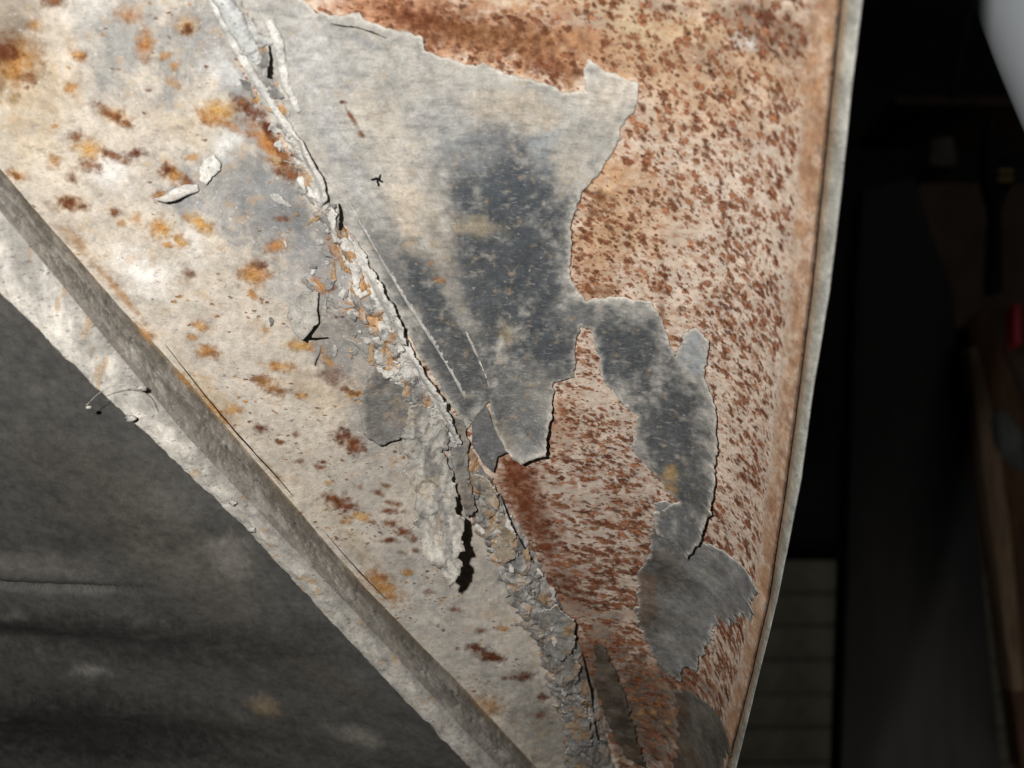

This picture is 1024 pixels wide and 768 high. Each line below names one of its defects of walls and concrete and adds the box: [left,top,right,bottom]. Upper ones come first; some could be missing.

rust [0,41,36,101]
rust [52,124,140,171]
rust [200,95,299,183]
peeling [154,184,199,202]
crack [336,203,344,230]
crack [303,295,328,343]
peeling [236,0,759,768]
crack [165,345,292,495]
rust [202,362,405,480]
rust [313,482,417,552]
crack [500,493,534,562]
crack [582,654,600,744]